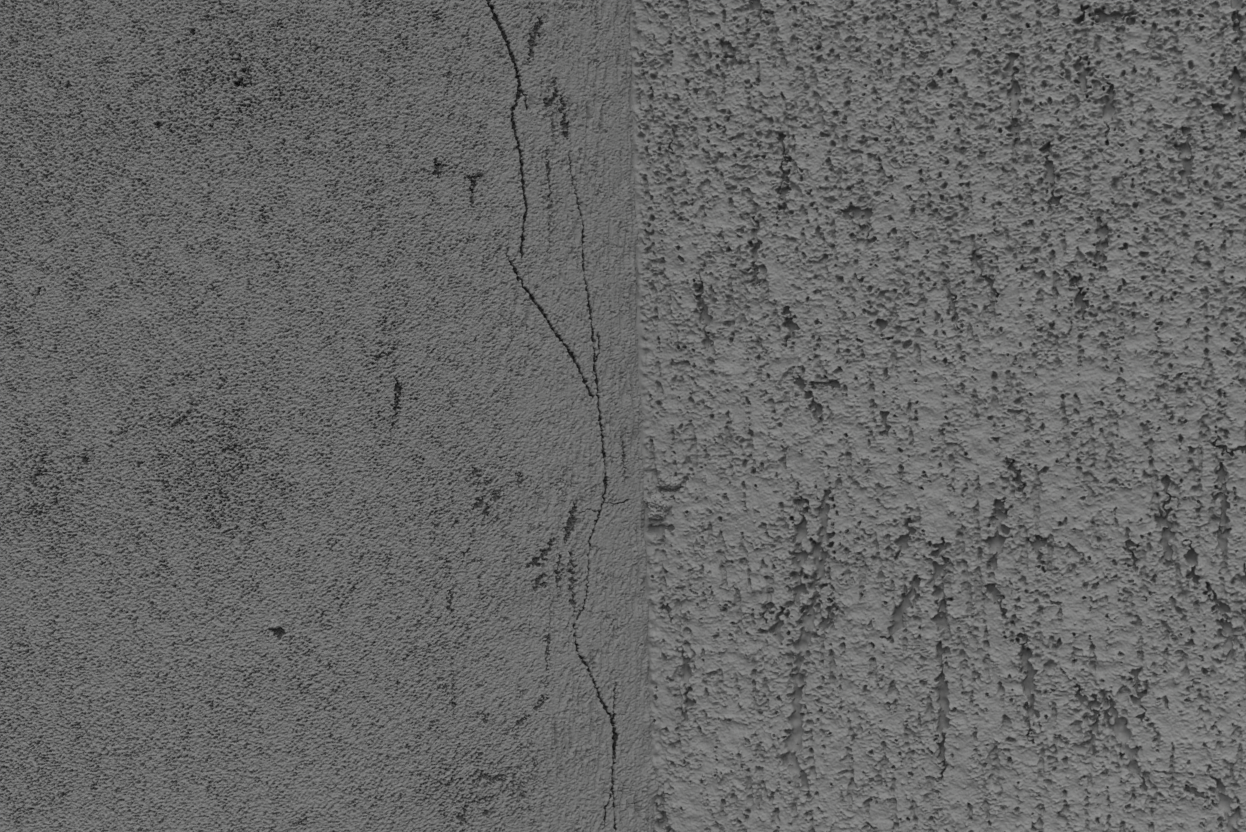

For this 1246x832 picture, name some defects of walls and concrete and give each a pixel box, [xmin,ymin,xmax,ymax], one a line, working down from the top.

crack [486,0,627,830]